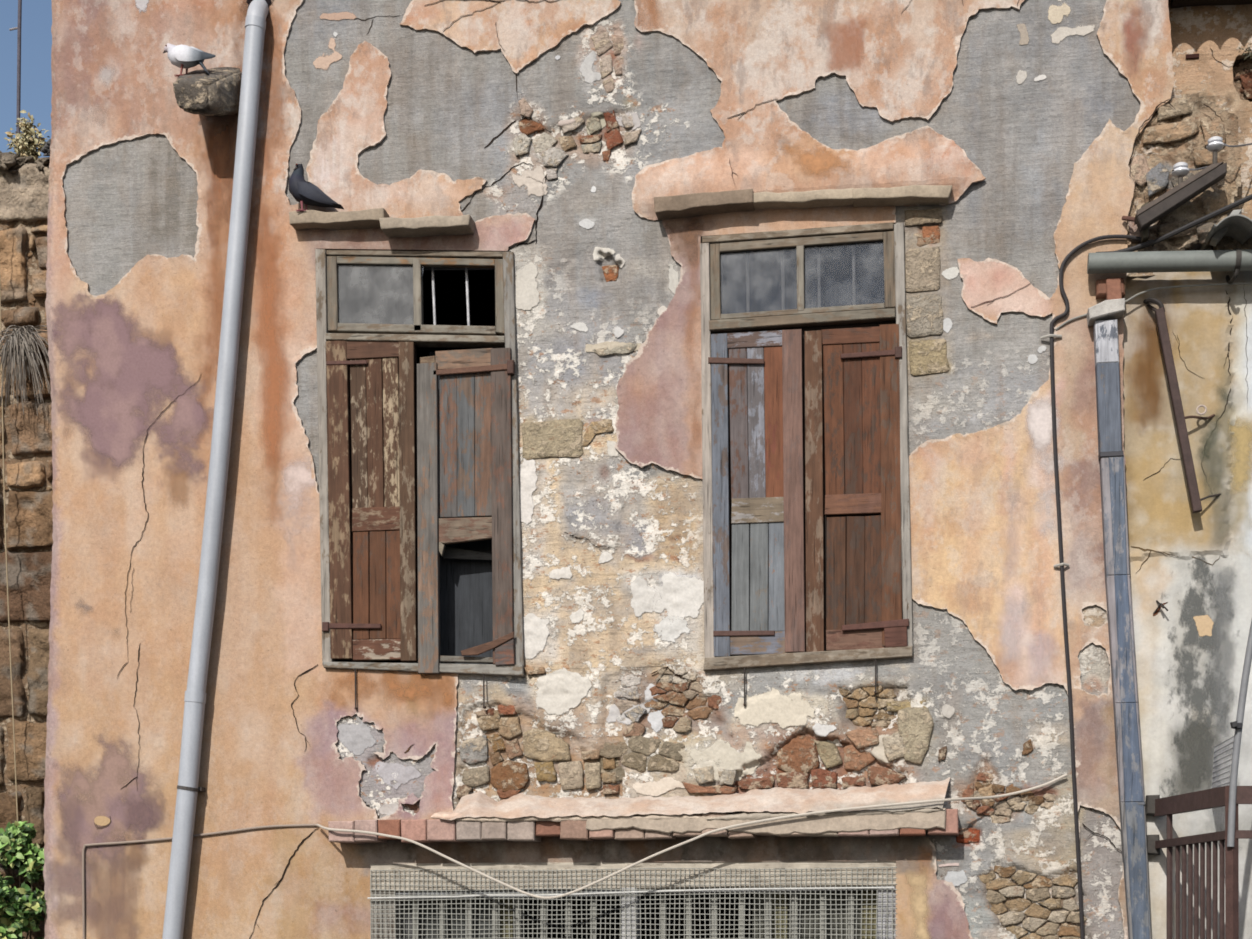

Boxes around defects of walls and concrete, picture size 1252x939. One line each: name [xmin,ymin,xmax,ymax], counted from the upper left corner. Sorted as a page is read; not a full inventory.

spalling [1233,44,1252,99]
spalling [63,134,199,296]
leakage [53,295,208,500]
spalling [284,0,1140,939]
crack [117,377,200,789]
crack [291,664,318,750]
leakage [1168,557,1233,796]
crack [249,828,318,939]